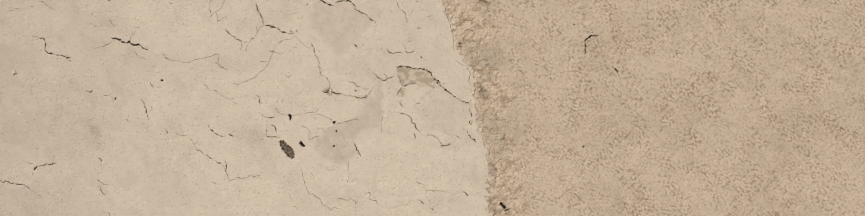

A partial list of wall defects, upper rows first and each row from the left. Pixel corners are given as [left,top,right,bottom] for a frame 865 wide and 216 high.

crack [33,36,70,61]
crack [95,0,477,146]
peeling [280,0,529,216]
crack [0,162,56,198]
crack [177,125,259,184]